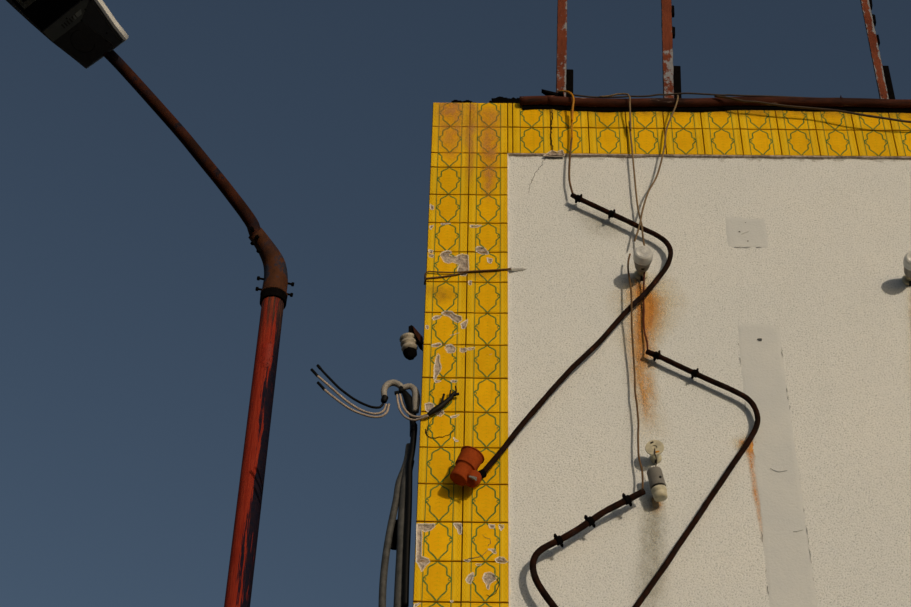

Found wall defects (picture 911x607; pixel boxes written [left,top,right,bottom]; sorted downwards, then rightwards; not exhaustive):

spalling [428,246,493,285]
spalling [425,310,468,329]
corrosion [632,283,663,399]
spalling [431,343,475,383]
spalling [416,523,435,572]
spalling [464,549,508,590]